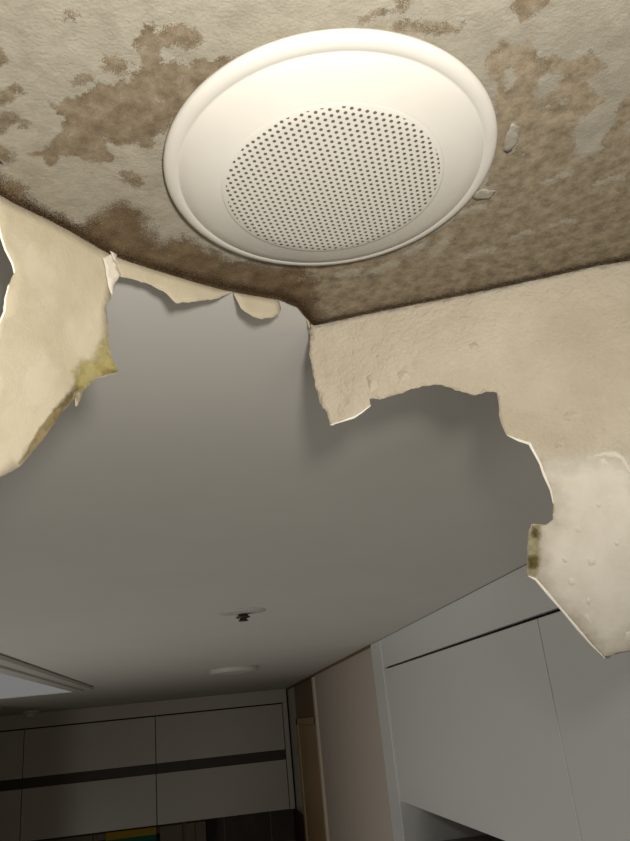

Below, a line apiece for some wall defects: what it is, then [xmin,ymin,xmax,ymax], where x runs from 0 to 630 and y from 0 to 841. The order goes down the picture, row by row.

peeling [0,21,238,167]
peeling [119,169,145,189]
damp [0,172,630,325]
damp [19,338,117,463]